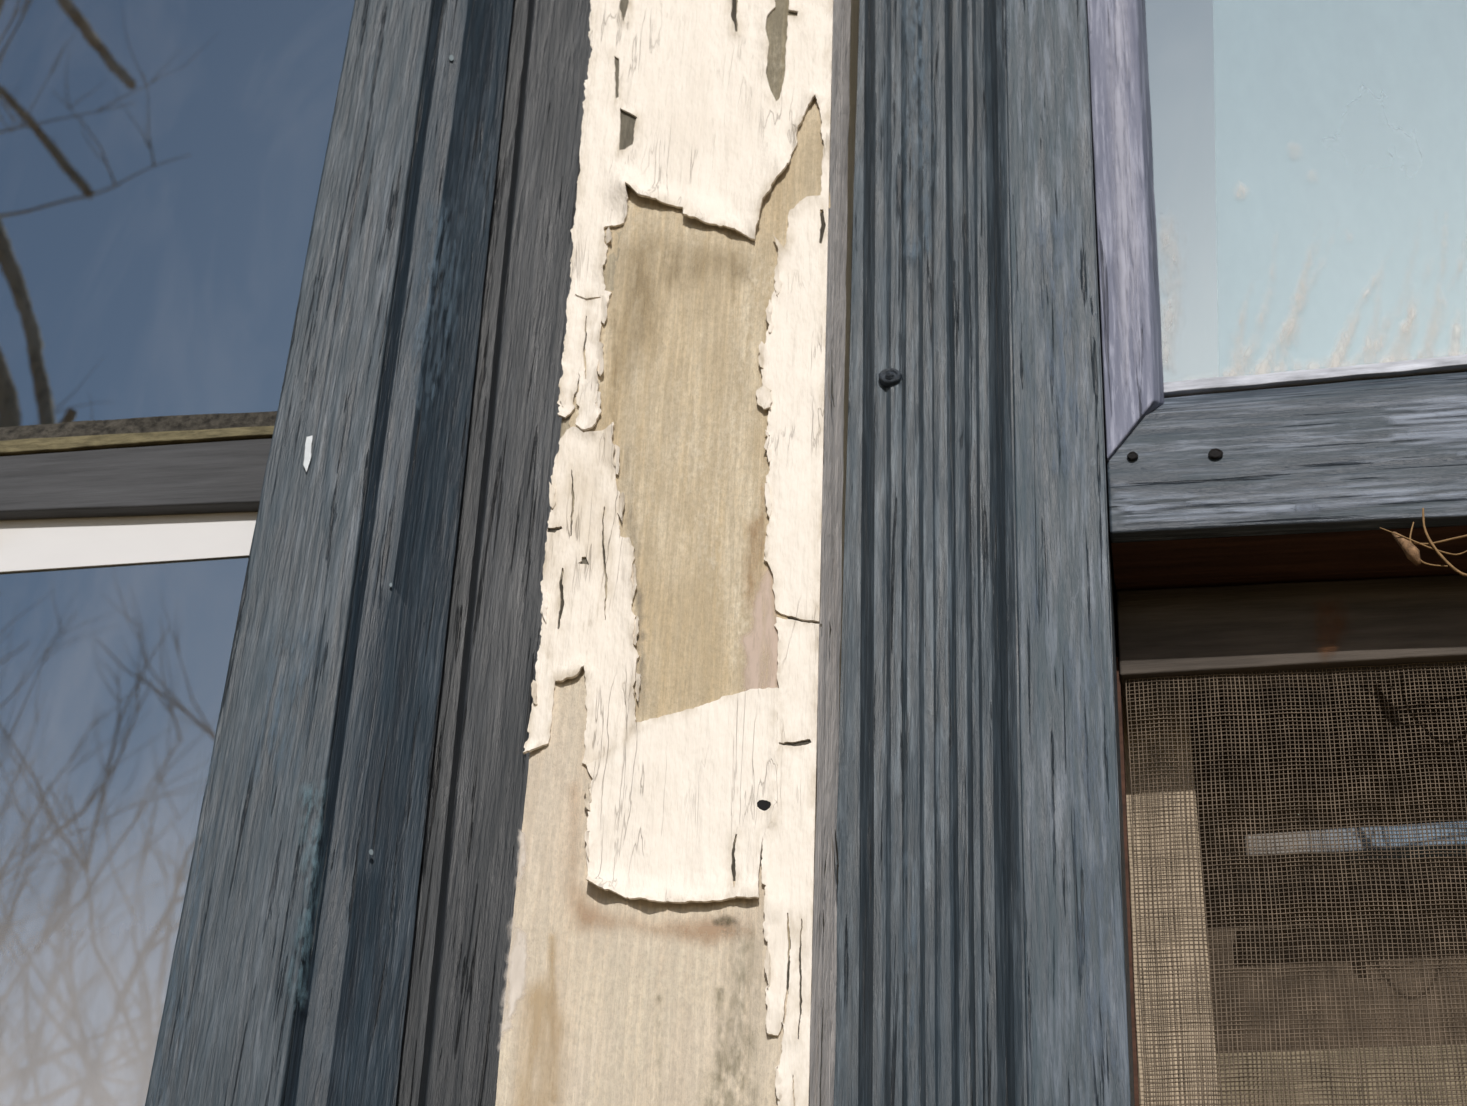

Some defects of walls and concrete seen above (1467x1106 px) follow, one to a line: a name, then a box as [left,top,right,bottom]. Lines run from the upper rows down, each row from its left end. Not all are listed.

peeling [620,0,629,21]
peeling [766,0,796,101]
peeling [615,58,637,150]
peeling [495,97,831,1106]
peeling [824,831,839,885]